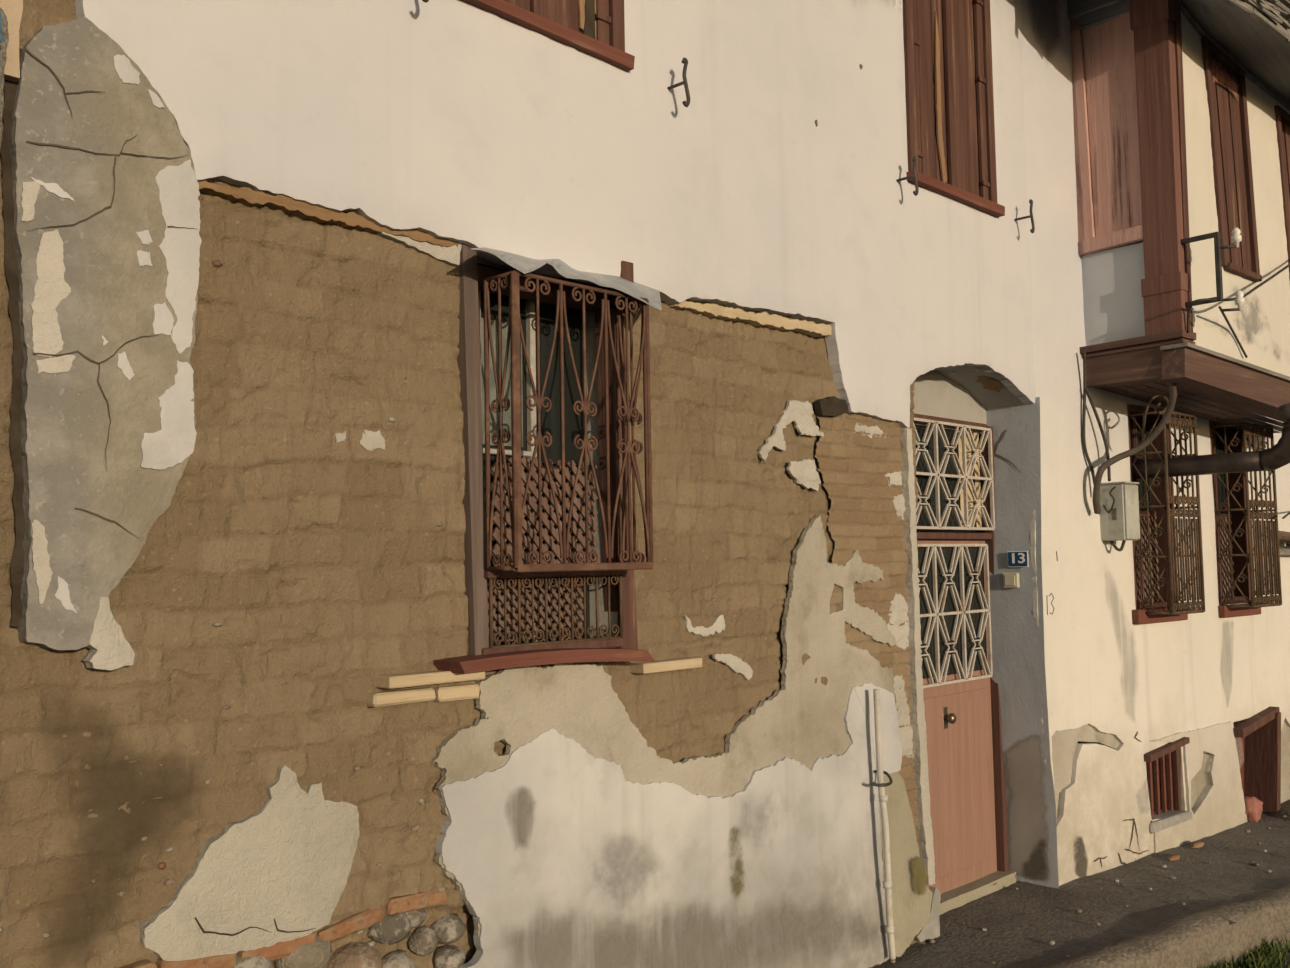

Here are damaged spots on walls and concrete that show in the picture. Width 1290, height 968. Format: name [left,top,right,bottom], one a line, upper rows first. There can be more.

crack [0,48,189,627]
flaking render [0,0,941,968]
flaking render [1052,725,1120,819]
damp [732,860,743,895]
damp [1025,841,1047,879]
damp [516,921,573,968]
damp [594,912,842,968]